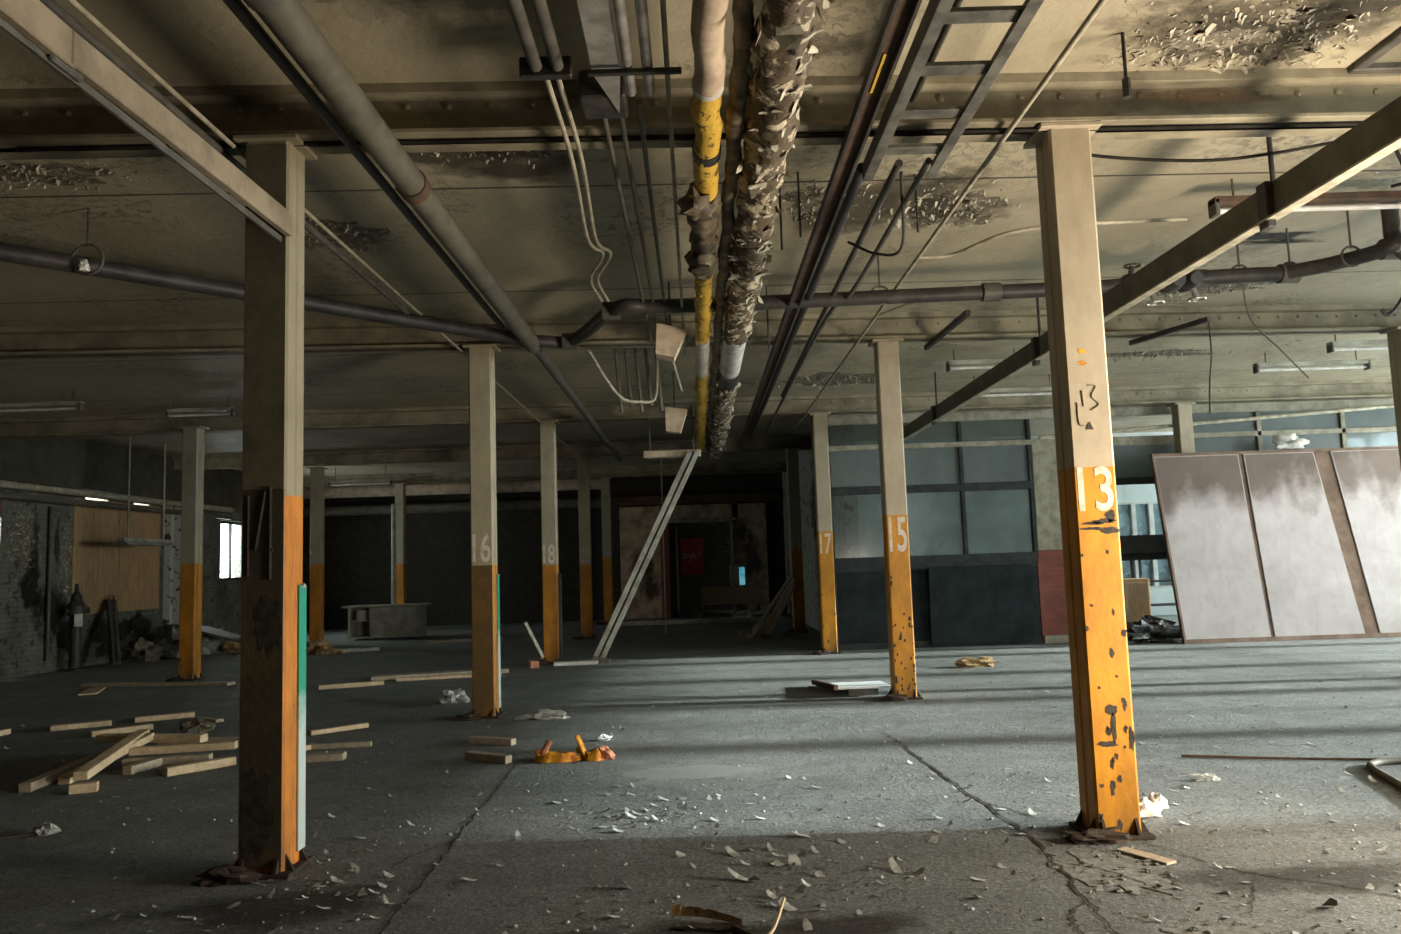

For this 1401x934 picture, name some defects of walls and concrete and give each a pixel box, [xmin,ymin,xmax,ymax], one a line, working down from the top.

peeling [1098,0,1389,75]
peeling [694,0,835,460]
peeling [844,174,1027,238]
peeling [775,371,875,389]
peeling [1080,510,1120,554]
peeling [1096,698,1135,796]
crack [882,731,1156,934]